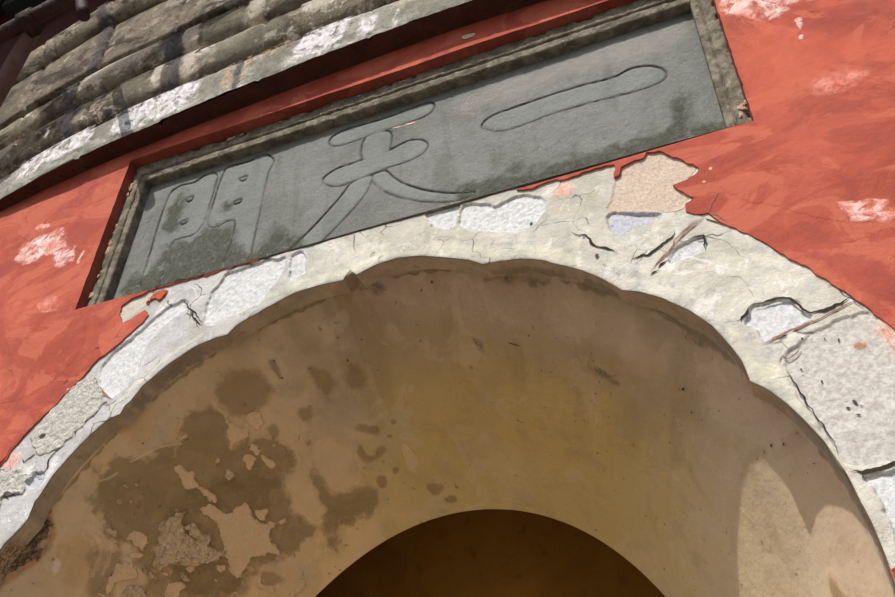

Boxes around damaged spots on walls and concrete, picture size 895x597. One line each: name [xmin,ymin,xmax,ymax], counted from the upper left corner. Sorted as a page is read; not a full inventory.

spalling [98,289,189,398]
crack [155,275,202,328]
spalling [203,252,306,326]
spalling [426,195,546,232]
crack [571,193,727,275]
peeling [607,152,695,234]
spalling [667,239,706,263]
spalling [743,300,812,341]
crack [740,297,895,480]
spalling [784,313,895,537]
flaking render [102,465,287,597]
leakage [93,407,377,597]